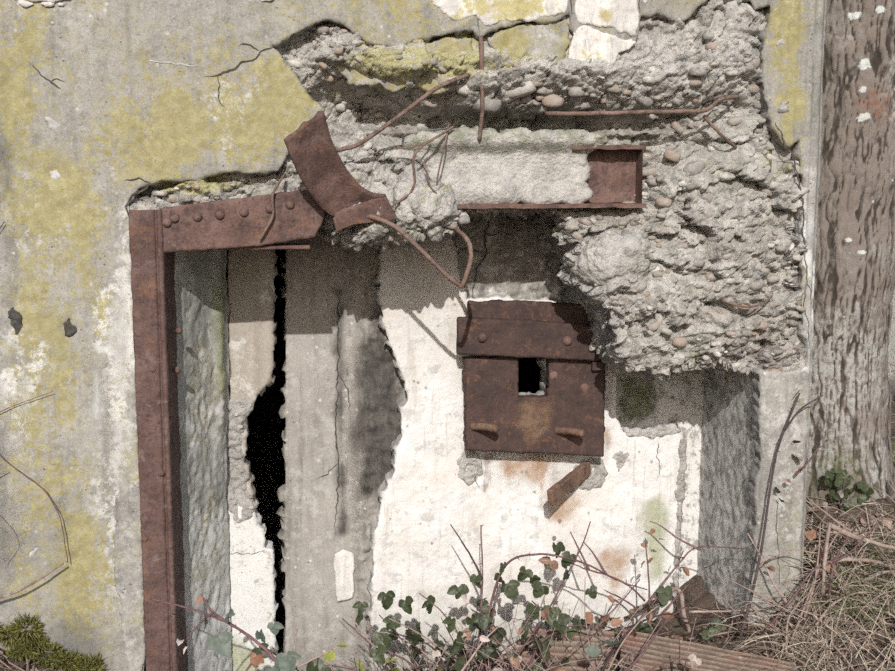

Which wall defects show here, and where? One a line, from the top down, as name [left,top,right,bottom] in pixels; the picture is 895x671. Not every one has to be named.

flaking render [19,0,64,8]
crack [146,43,274,105]
spalling [129,155,307,210]
spalling [274,0,810,382]
spalling [226,399,255,524]
peeling [333,549,355,602]